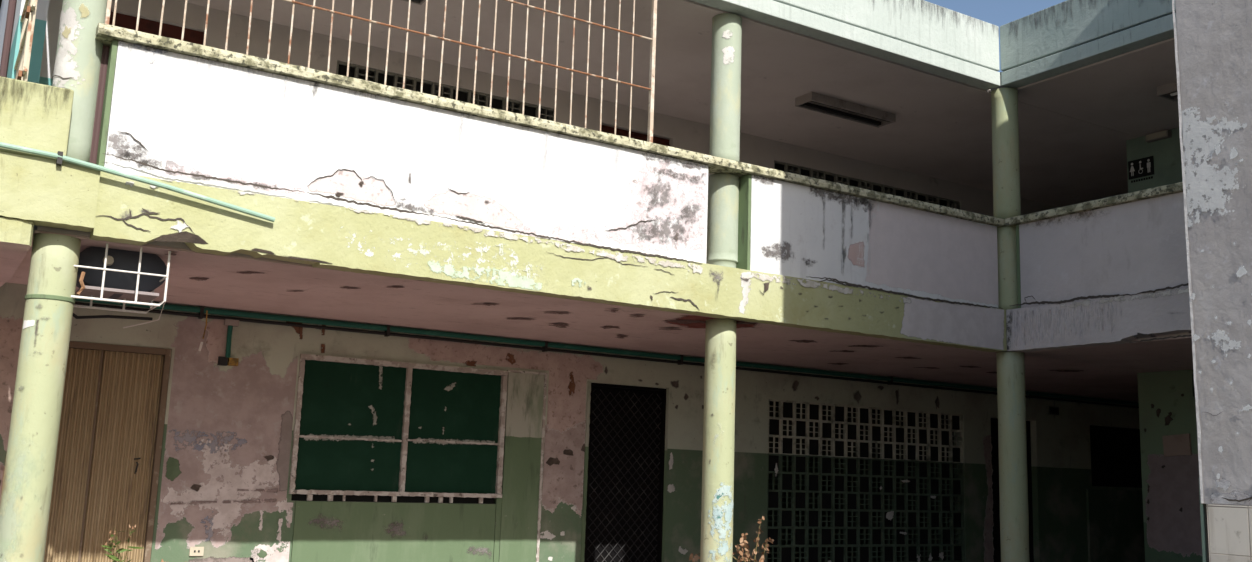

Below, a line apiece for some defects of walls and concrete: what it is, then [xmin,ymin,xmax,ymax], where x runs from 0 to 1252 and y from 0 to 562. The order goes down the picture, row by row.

water stain [2,76,70,97]
peeling [52,3,89,88]
spalling [308,169,405,206]
crack [99,153,703,311]
peeling [340,226,544,290]
spalling [424,188,523,229]
peeling [541,155,707,255]
crack [741,272,1189,309]
peeling [1182,105,1247,242]
peeling [0,304,48,502]
peeling [155,316,395,562]
peeling [408,333,608,516]